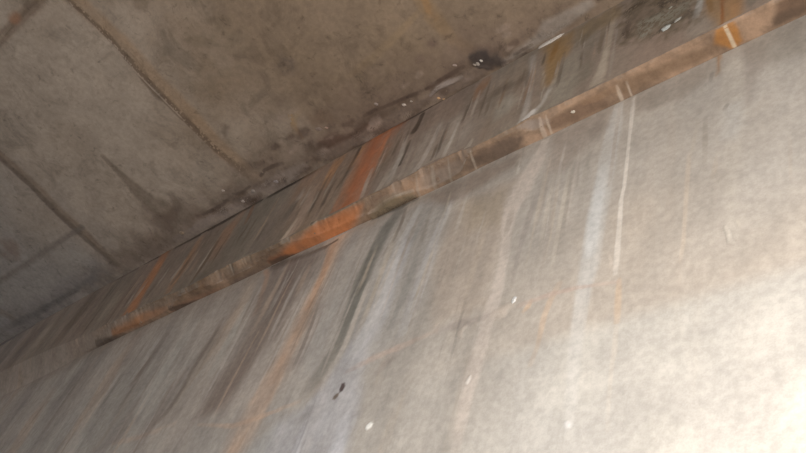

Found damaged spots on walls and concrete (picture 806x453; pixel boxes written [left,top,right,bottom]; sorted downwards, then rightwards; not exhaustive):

water stain [5,243,332,453]
water stain [0,0,580,371]
corrosion [217,117,412,453]
water stain [245,0,806,453]
corrosion [703,0,747,50]